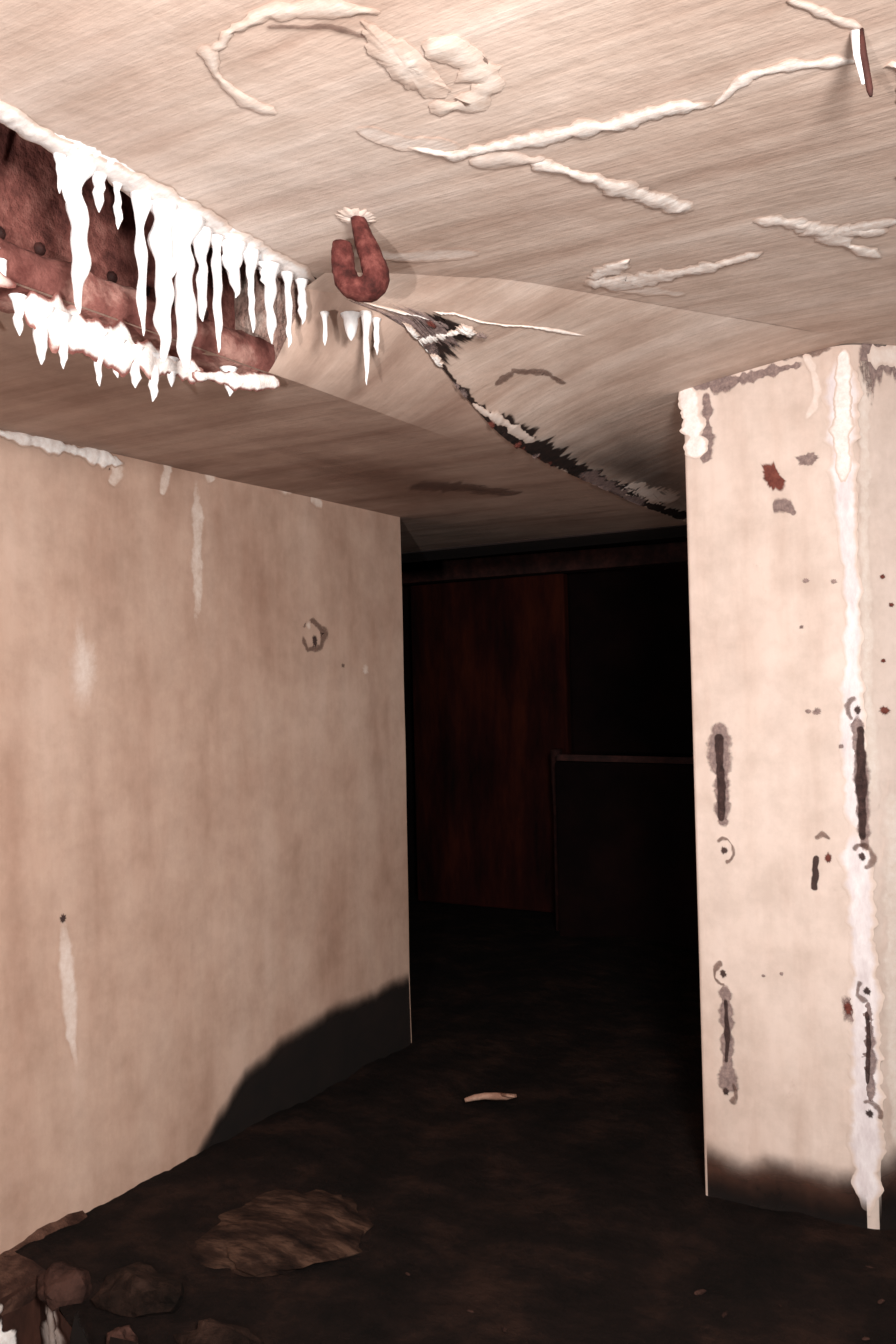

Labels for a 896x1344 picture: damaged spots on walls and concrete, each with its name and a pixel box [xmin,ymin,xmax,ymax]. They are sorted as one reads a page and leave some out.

peeling [363,302,440,323]
water stain [0,271,203,402]
water stain [220,366,238,396]
spalling [694,347,828,393]
spalling [860,343,896,393]
water stain [803,348,896,1217]
water stain [0,1302,18,1344]
water stain [39,1303,89,1344]